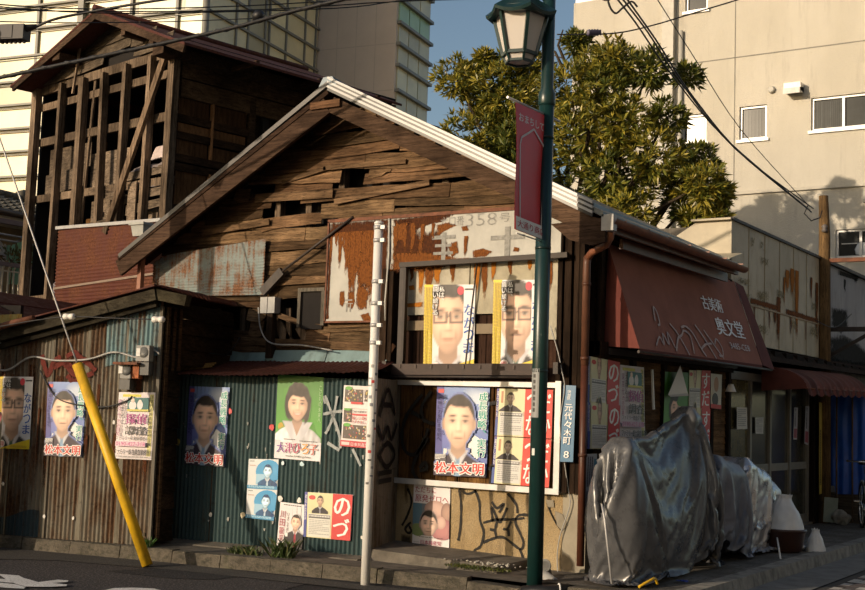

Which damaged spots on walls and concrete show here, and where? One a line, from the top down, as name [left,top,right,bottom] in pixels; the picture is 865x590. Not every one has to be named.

corrosion [407,265,456,307]
corrosion [474,262,496,293]
corrosion [751,268,820,340]